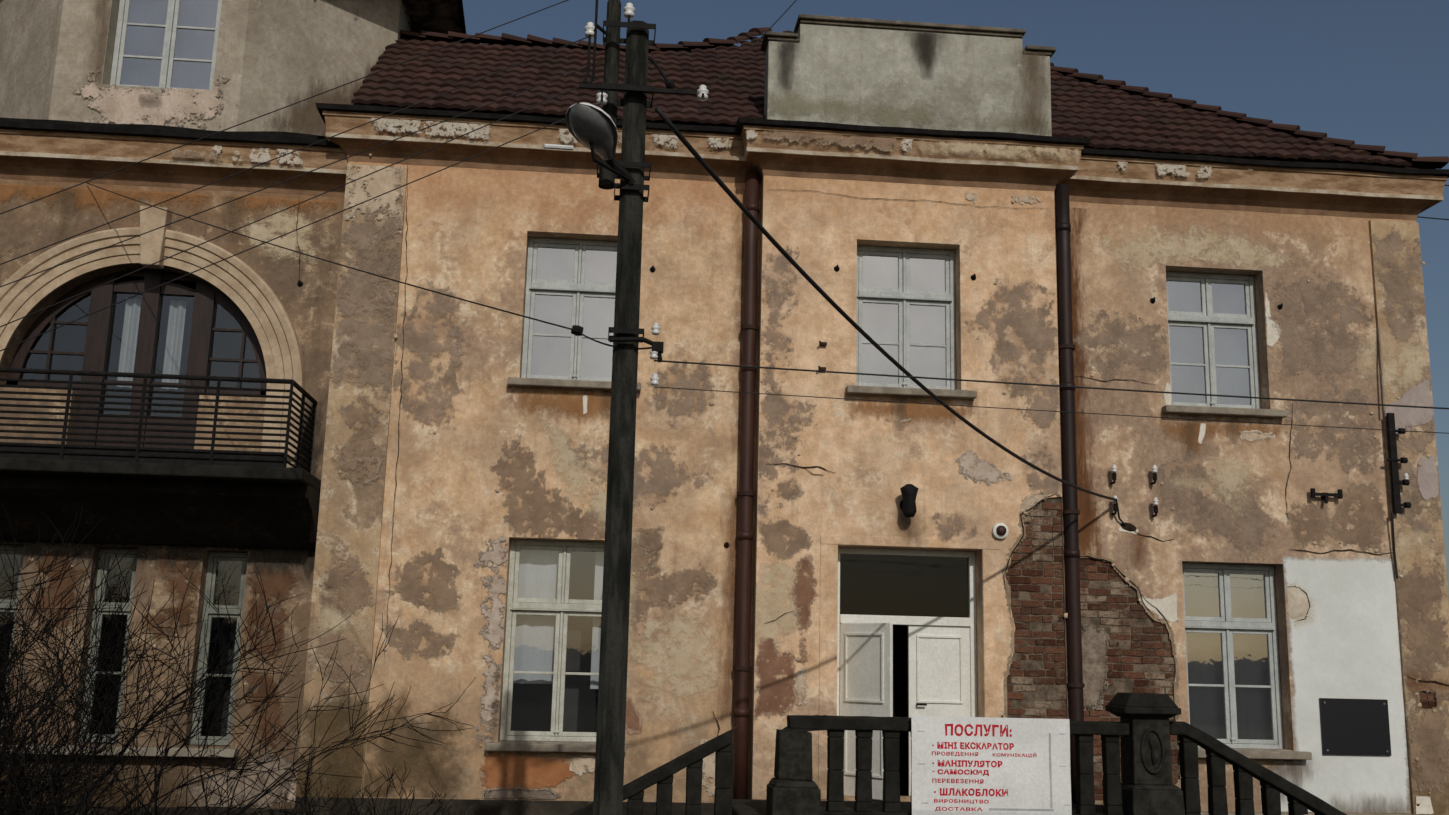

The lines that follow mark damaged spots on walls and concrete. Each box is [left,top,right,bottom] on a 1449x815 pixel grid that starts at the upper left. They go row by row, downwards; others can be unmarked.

peeling [69,66,238,129]
peeling [170,145,303,164]
peeling [371,118,490,139]
peeling [651,134,680,148]
peeling [1156,164,1212,178]
peeling [965,278,1060,428]
peeling [629,444,717,634]
peeling [1155,227,1449,814]
crack [1286,403,1393,555]
spalling [172,565,302,808]
peeling [307,434,609,800]
spalling [956,447,1182,804]